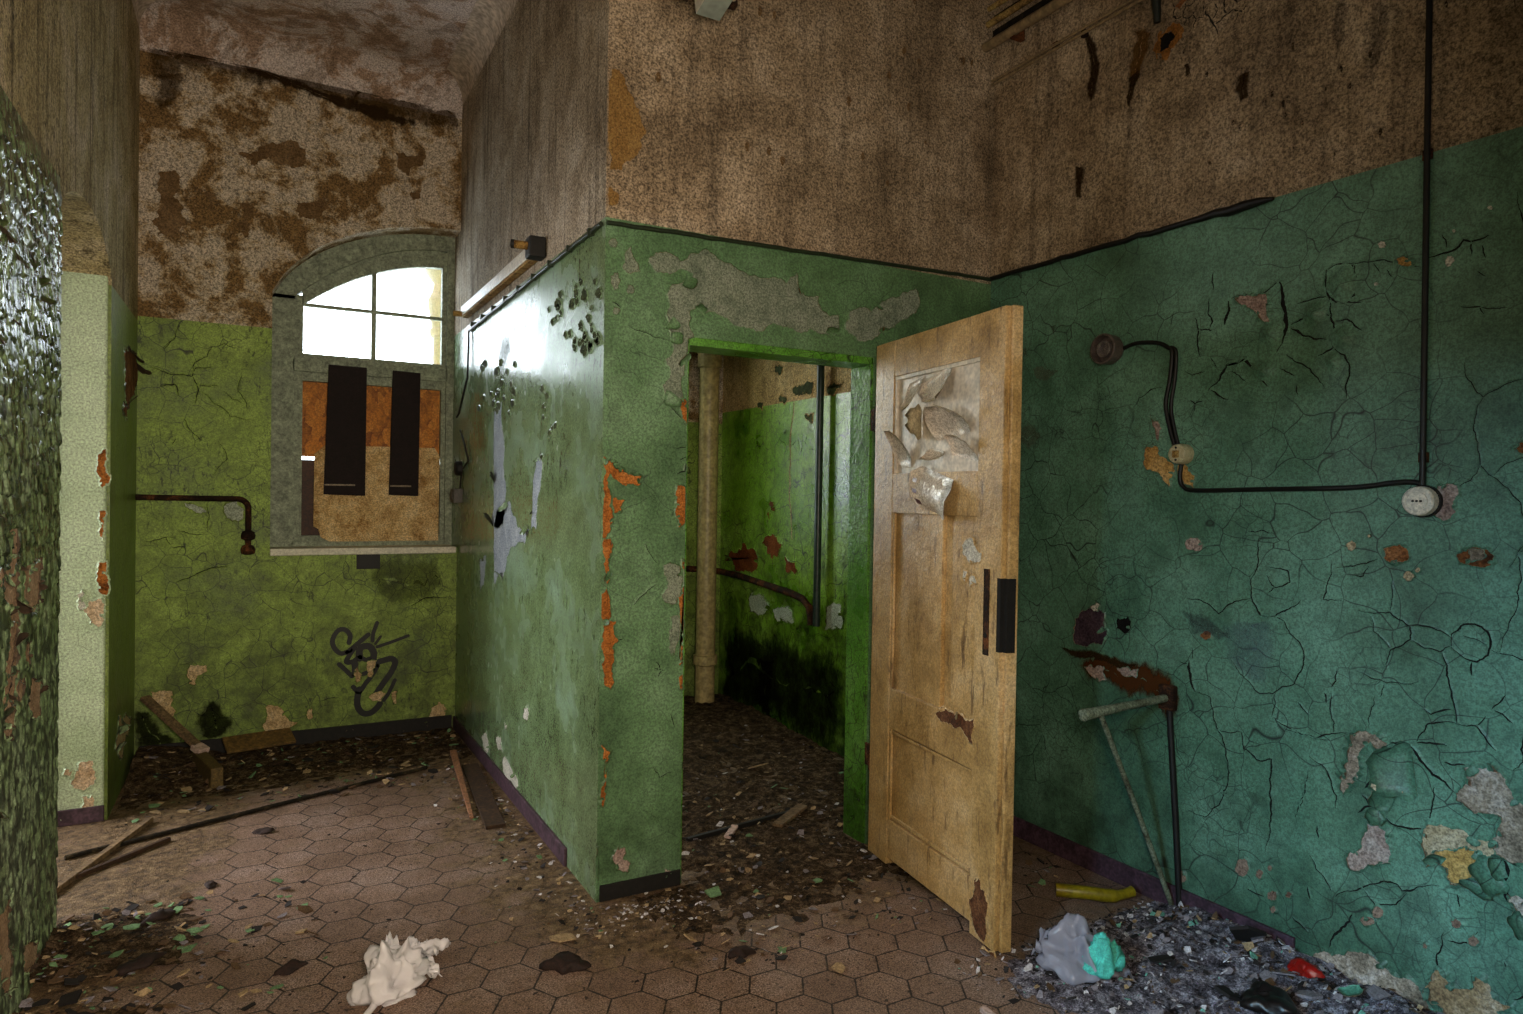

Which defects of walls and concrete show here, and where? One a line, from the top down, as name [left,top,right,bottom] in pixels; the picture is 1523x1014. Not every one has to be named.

leakage [150,49,457,127]
peeling [0,219,57,304]
peeling [150,170,188,238]
peeling [237,138,307,169]
peeling [547,238,920,425]
crack [1133,191,1523,411]
peeling [0,510,49,742]
peeling [76,510,111,628]
crack [1179,362,1523,1002]
spalling [481,703,530,789]
peeling [1335,725,1417,874]
spalling [1304,941,1517,1014]